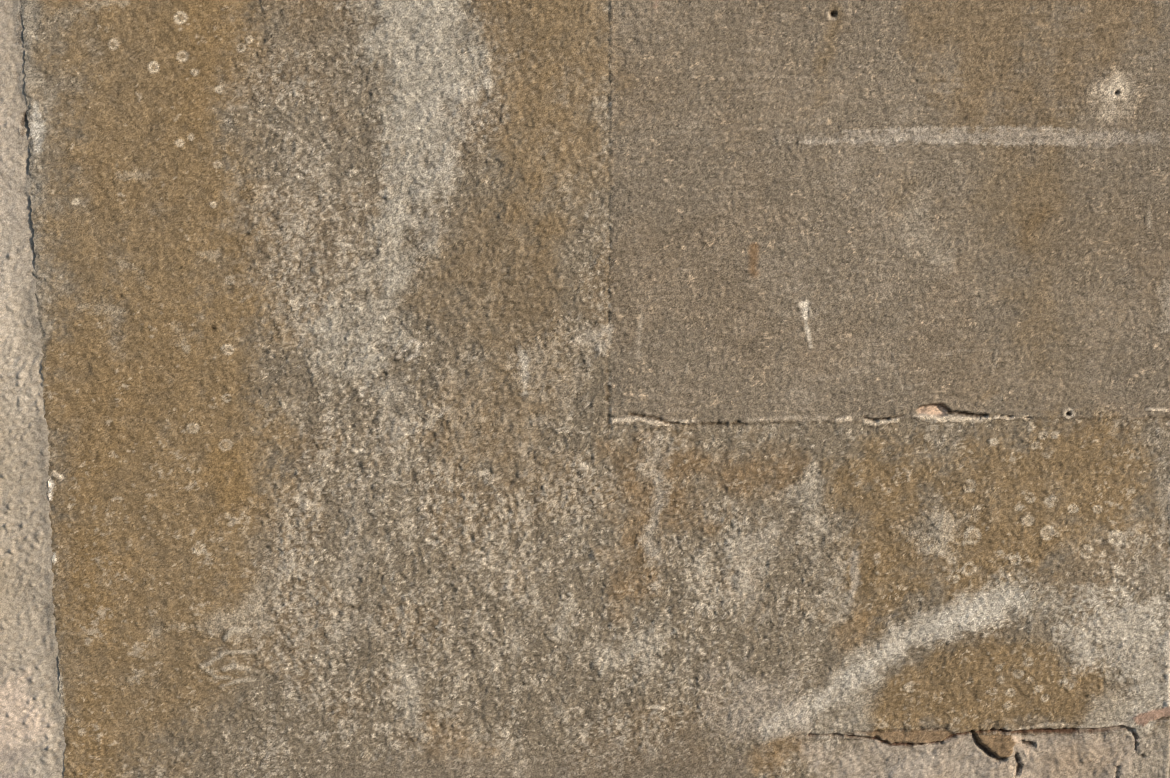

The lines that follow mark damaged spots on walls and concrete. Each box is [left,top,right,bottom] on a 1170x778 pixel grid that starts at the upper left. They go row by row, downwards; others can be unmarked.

spalling [824,8,840,21]
crack [606,0,620,146]
damp [25,0,309,778]
damp [224,0,635,668]
damp [585,0,1170,778]
crack [602,351,1170,450]
spalling [914,402,953,417]
damp [502,585,580,703]
damp [380,653,505,767]
crack [863,721,1079,778]
crack [1113,739,1146,778]